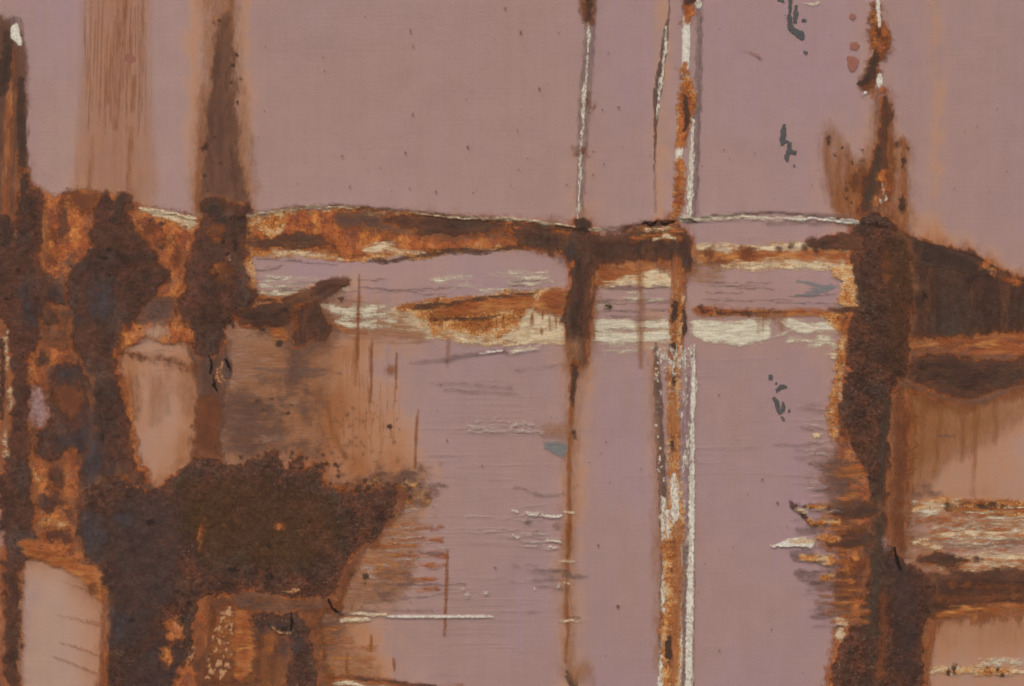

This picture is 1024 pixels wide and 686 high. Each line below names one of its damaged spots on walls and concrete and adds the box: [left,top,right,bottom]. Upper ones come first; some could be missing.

rust [0,16,30,234]
rust [128,0,572,327]
rust [669,62,697,221]
rust [682,0,696,24]
rust [826,0,912,230]
rust [908,331,1024,357]
rust [0,302,449,686]
rust [384,288,589,686]